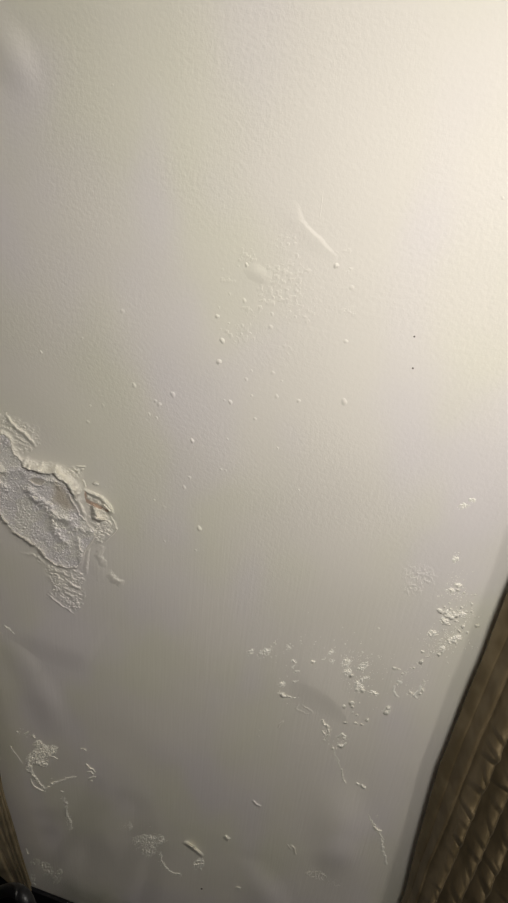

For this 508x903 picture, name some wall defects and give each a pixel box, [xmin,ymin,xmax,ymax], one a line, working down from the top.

peeling [0,410,125,615]
peeling [9,731,96,831]